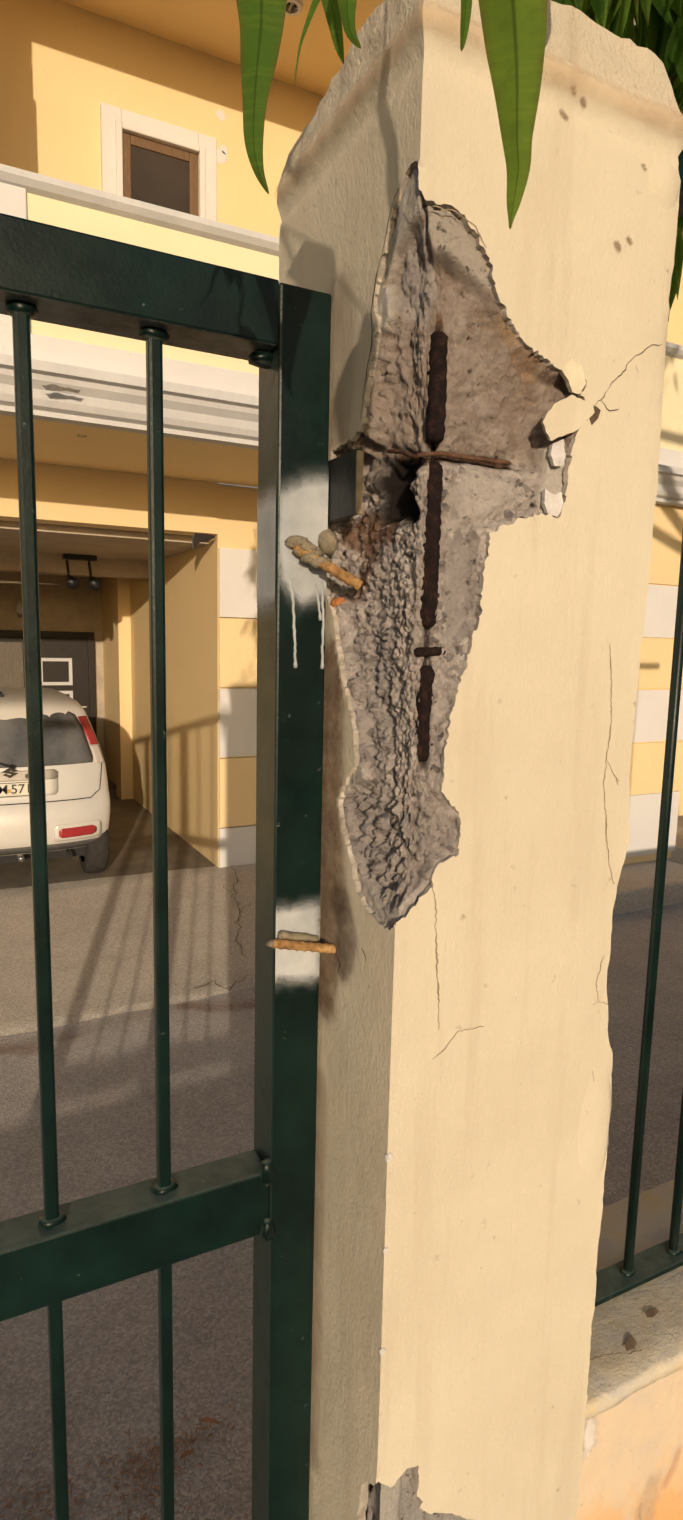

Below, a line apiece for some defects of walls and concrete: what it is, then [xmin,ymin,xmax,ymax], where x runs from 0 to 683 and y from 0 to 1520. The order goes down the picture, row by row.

crack [593,344,662,411]
spalling [329,166,601,927]
spalling [366,1467,474,1520]